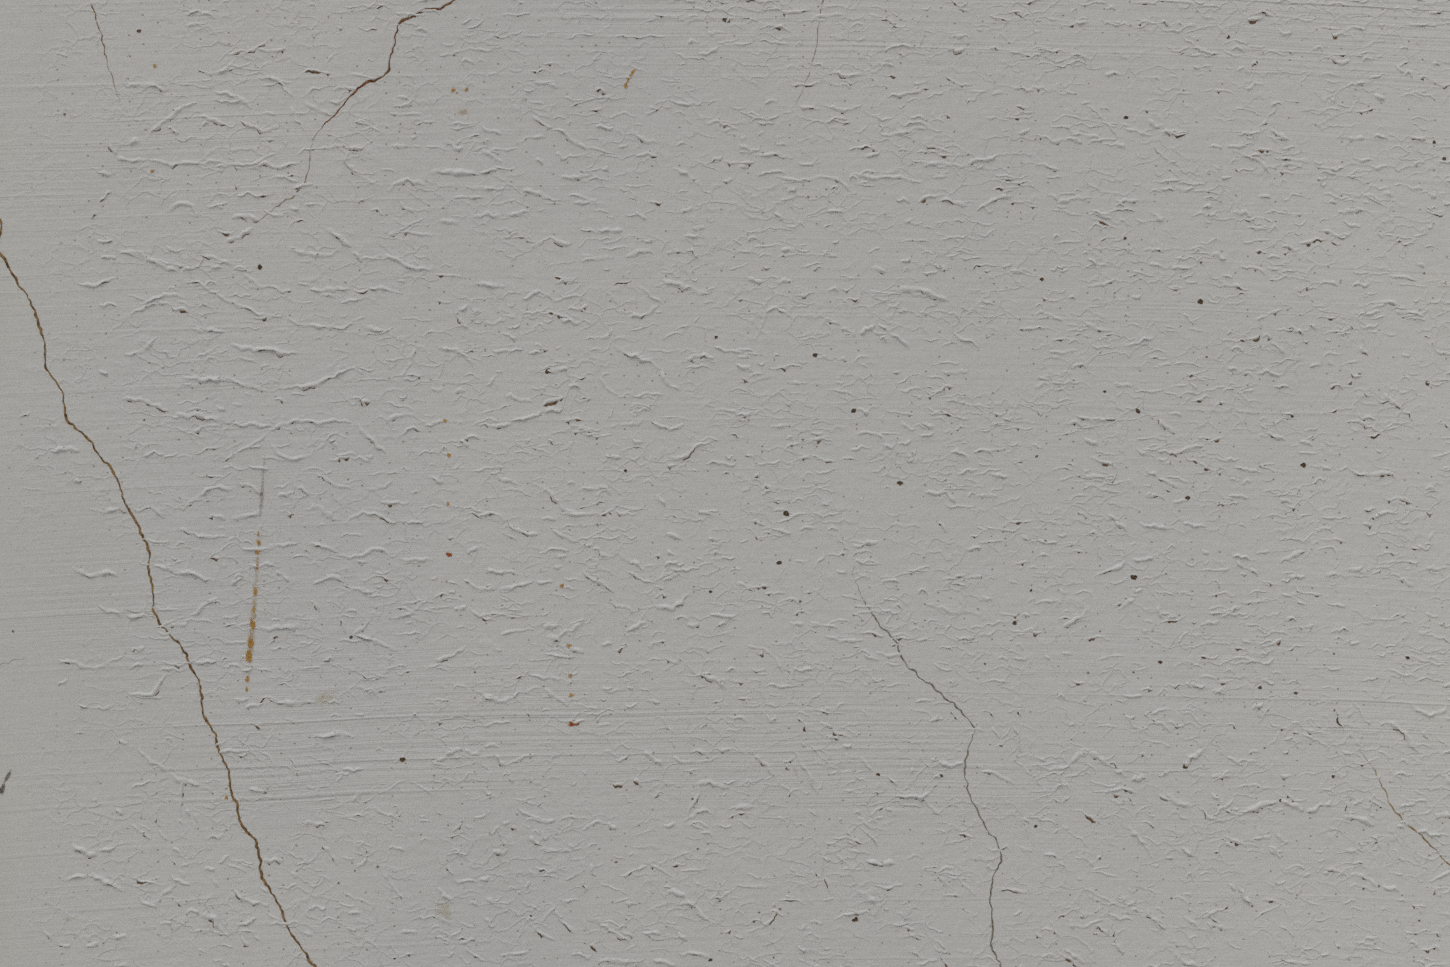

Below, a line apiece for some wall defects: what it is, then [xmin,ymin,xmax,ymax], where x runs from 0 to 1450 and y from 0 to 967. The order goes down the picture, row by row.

crack [260,0,460,220]
crack [0,217,319,967]
rust [245,587,257,691]
crack [851,565,1004,967]
crack [1361,752,1450,865]